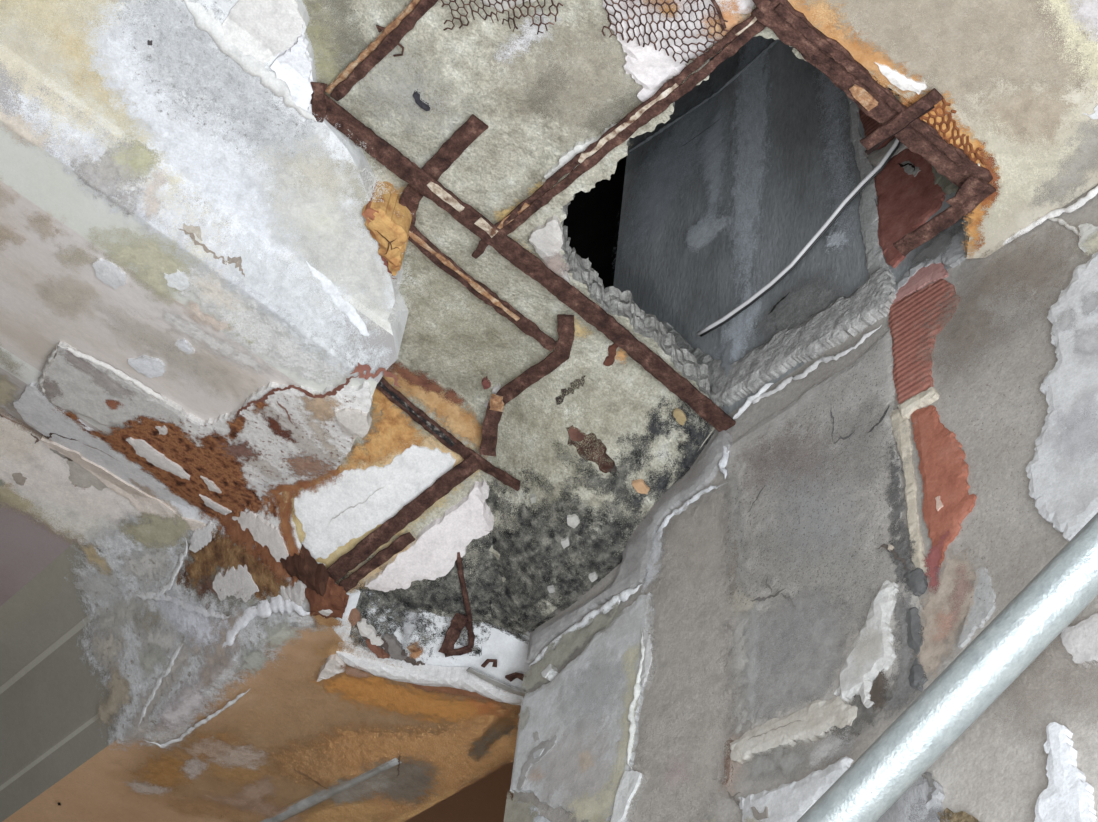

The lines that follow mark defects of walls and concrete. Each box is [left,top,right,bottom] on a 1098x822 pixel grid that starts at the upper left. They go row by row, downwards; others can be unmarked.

spalling [36,341,187,435]
peeling [126,437,289,562]
rust [53,362,487,631]
damp [73,344,716,822]
spalling [91,0,726,410]
spalling [153,148,715,637]
peeling [317,592,657,822]
rust [574,316,593,339]
rust [603,343,628,366]
rust [632,479,650,495]
rust [788,0,1002,258]
flaking render [722,223,1098,822]